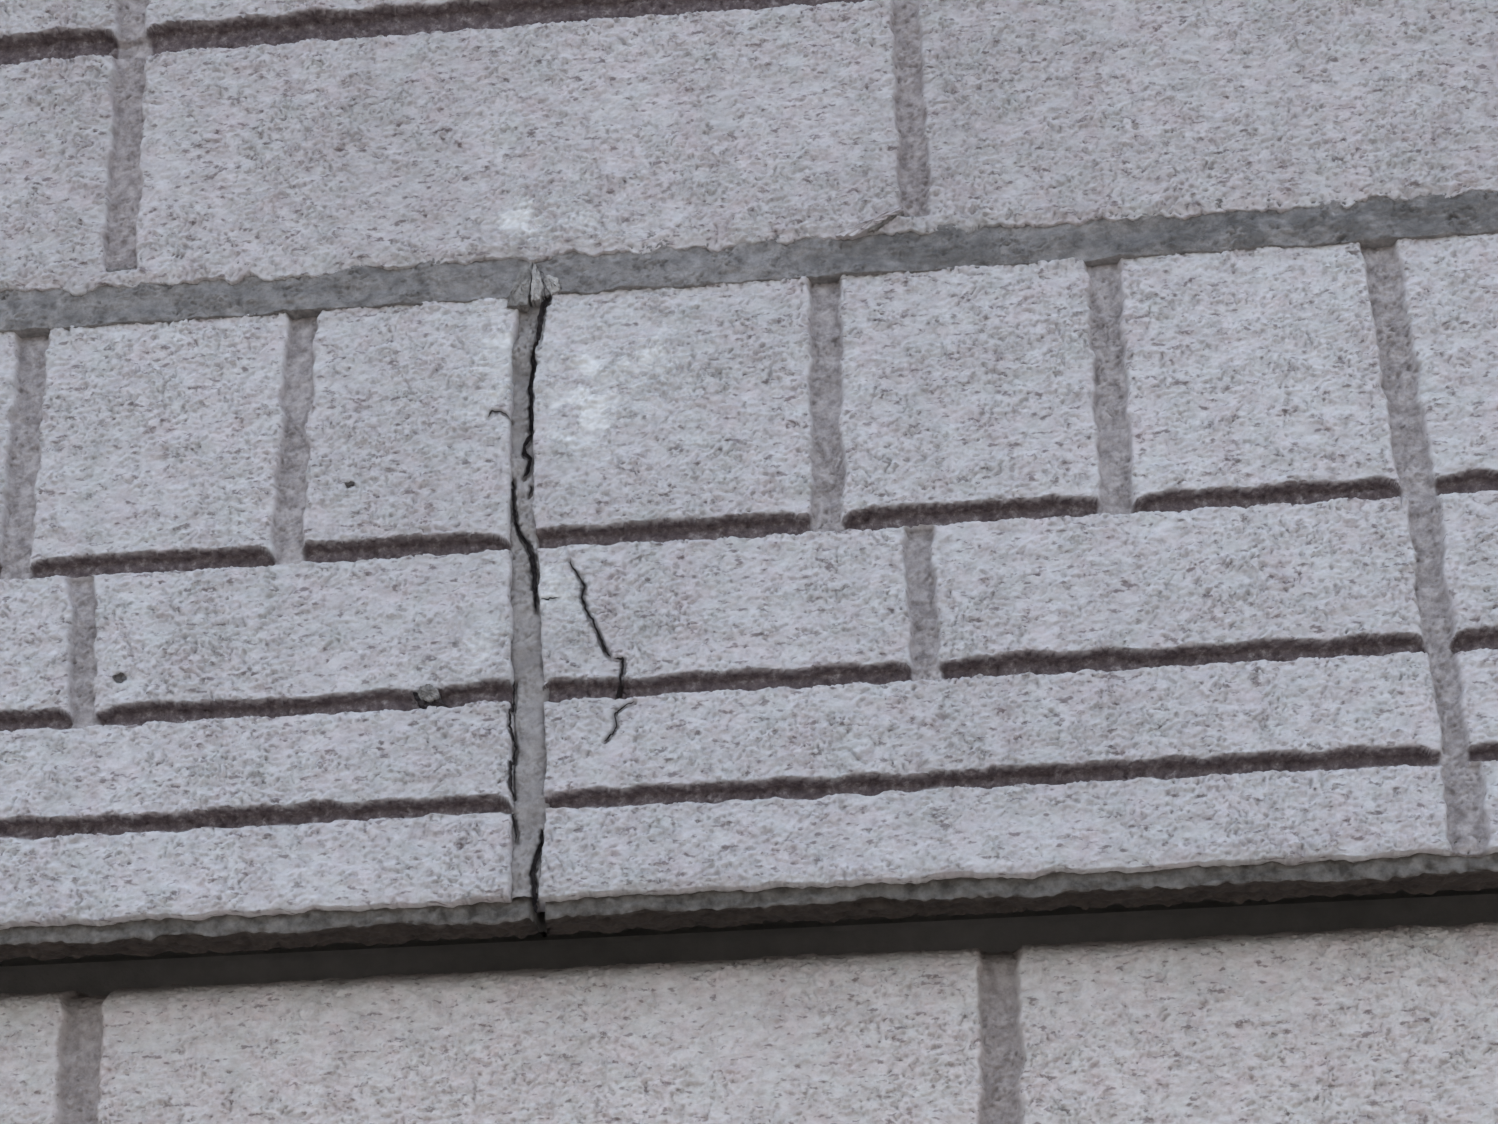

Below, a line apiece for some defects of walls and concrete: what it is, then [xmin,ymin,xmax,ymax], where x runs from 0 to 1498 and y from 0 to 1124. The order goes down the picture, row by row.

crack [488,271,634,742]
crack [508,681,544,913]